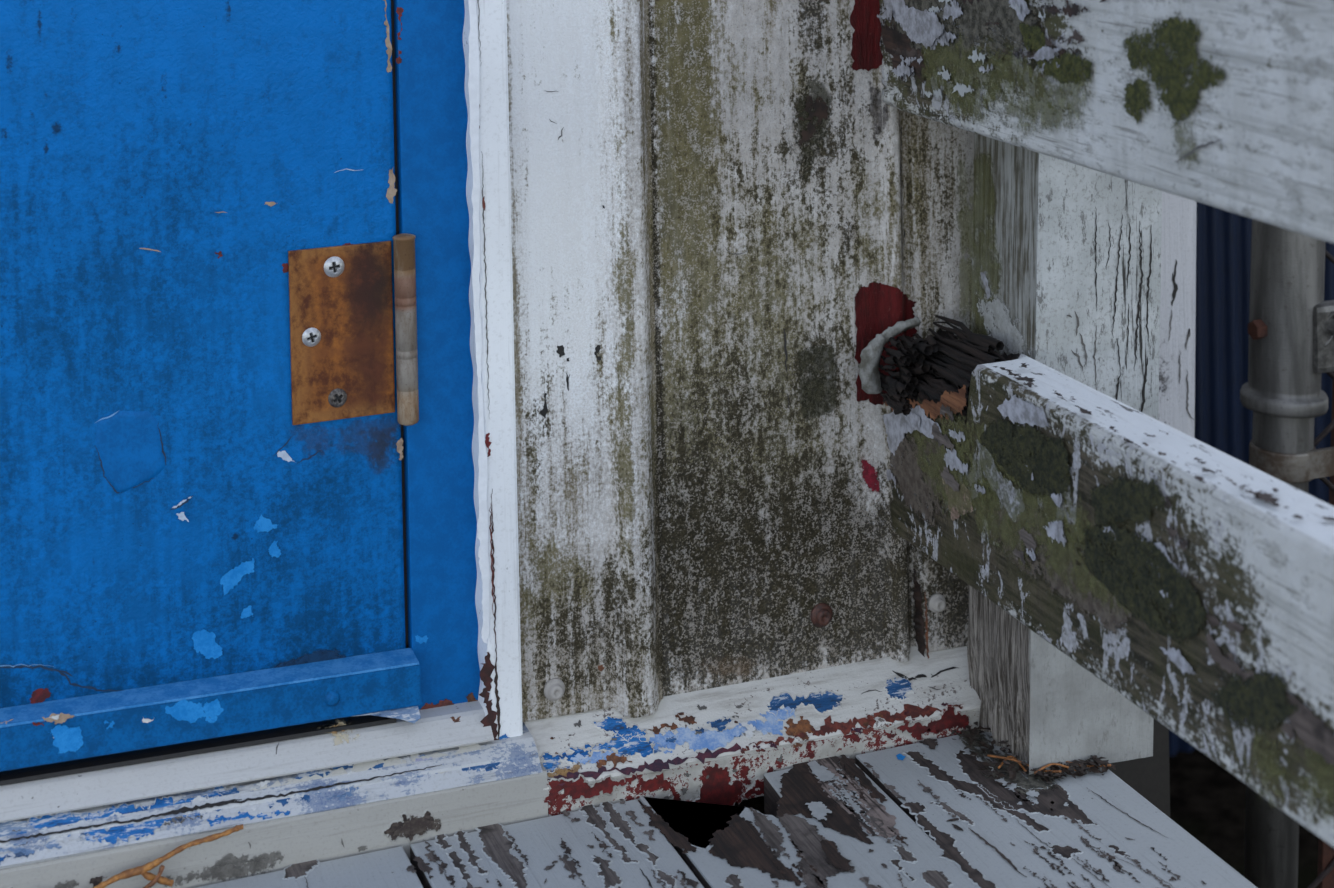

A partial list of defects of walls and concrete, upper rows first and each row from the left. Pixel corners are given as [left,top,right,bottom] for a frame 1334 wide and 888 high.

crack [1067,207,1196,421]
leakage [798,345,837,422]
peeling [0,0,510,865]
peeling [1109,414,1334,521]
peeling [883,676,916,701]
peeling [382,799,699,888]
peeling [539,690,845,774]
peeling [723,873,746,888]
peeling [805,802,832,820]
peeling [807,760,835,782]
peeling [863,727,1100,888]
peeling [1106,844,1139,874]